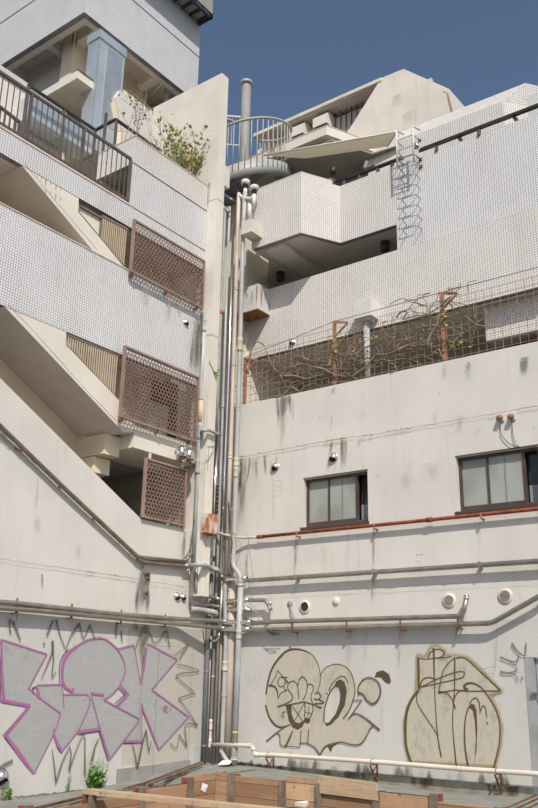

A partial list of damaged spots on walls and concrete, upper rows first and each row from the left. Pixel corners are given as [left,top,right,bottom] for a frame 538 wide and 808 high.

damp [136,565,150,606]
damp [136,624,149,659]